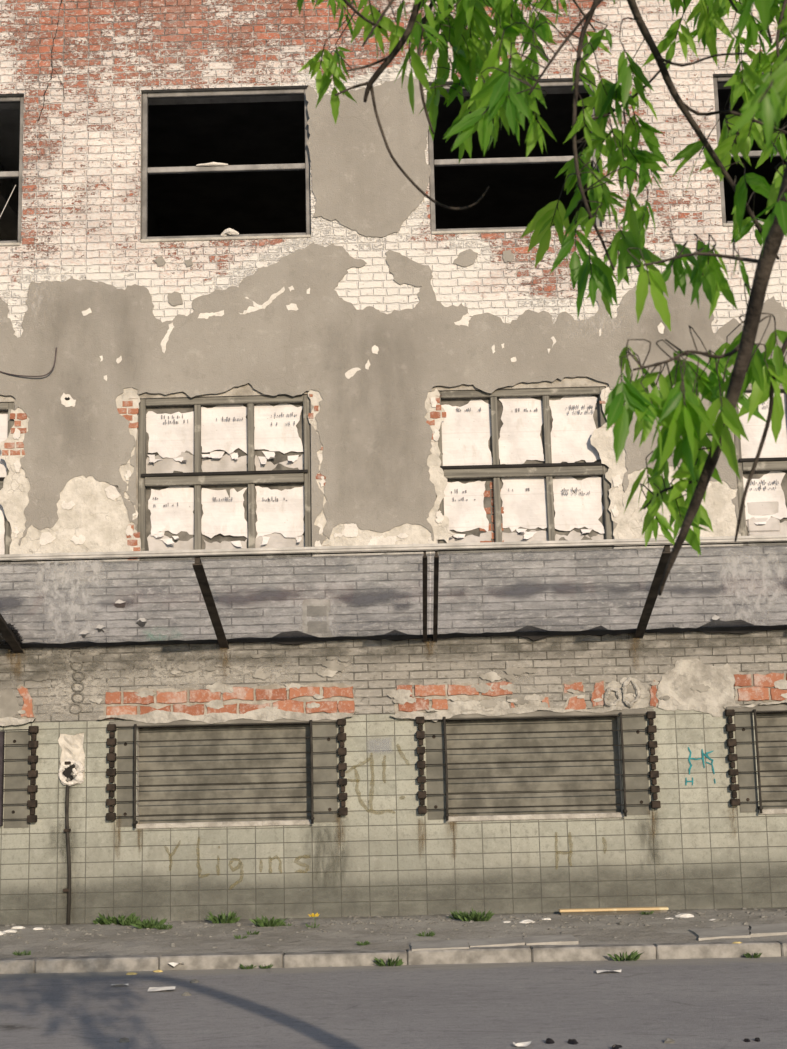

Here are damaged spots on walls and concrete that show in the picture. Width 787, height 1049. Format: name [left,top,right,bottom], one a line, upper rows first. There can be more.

crack [38,0,78,121]
flaking render [306,75,431,238]
flaking render [453,249,478,267]
flaking render [167,291,183,306]
flaking render [198,310,224,319]
flaking render [240,286,299,314]
flaking render [454,313,471,326]
flaking render [0,387,141,563]
flaking render [308,388,456,556]
flaking render [0,624,355,719]
flaking render [387,666,550,714]
peeling [562,659,787,717]